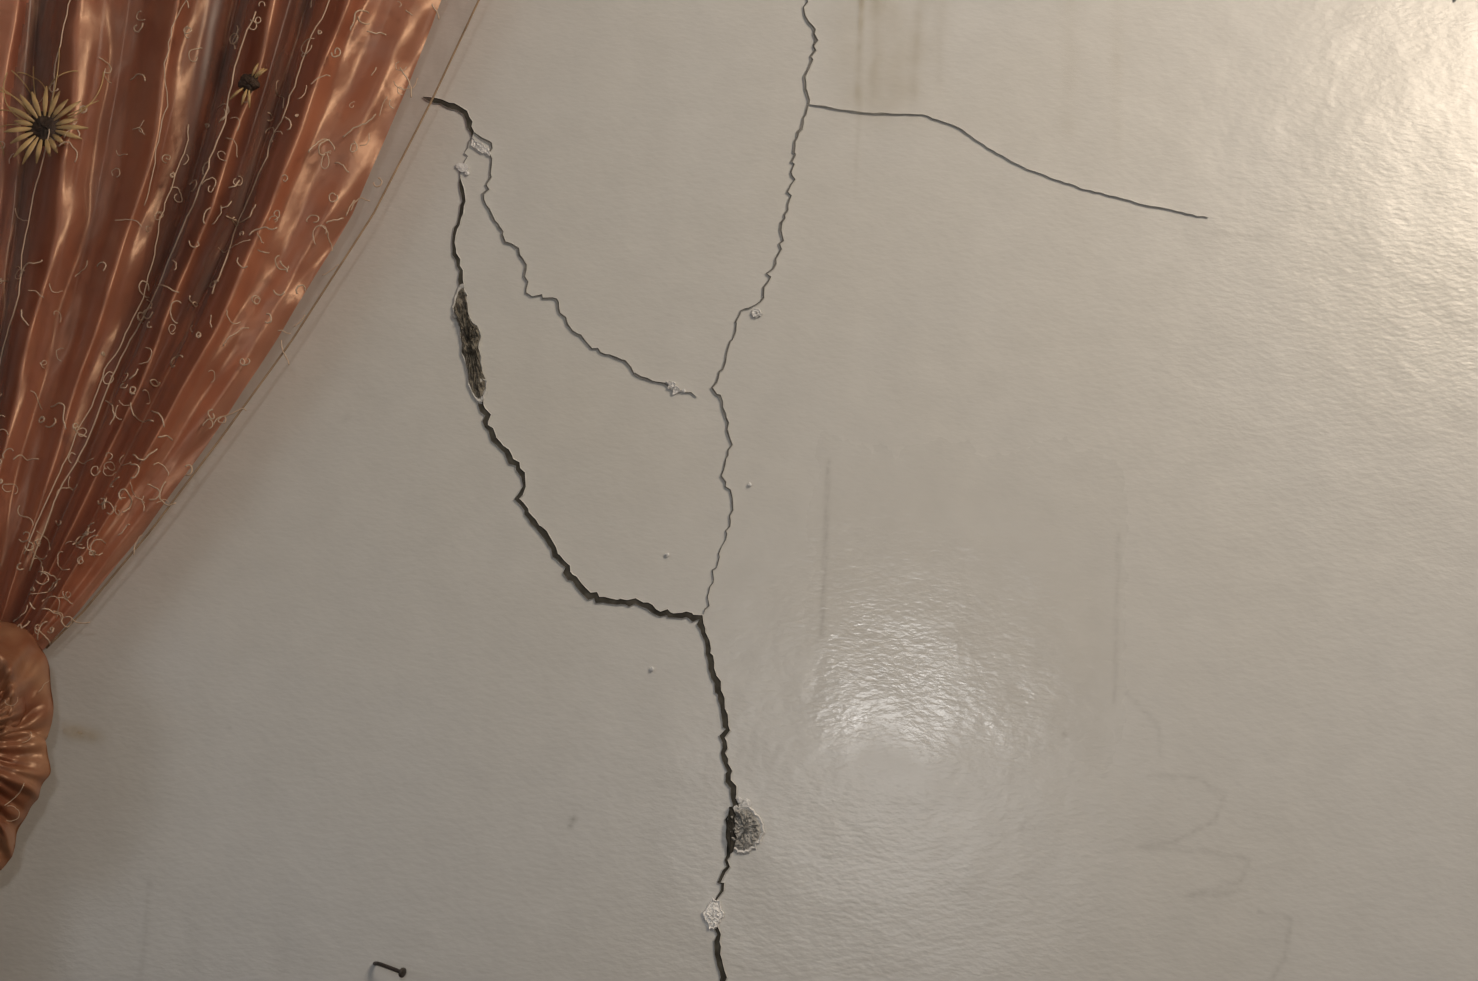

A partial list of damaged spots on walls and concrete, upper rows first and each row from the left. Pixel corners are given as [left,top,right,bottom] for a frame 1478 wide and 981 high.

crack [423,0,1208,981]